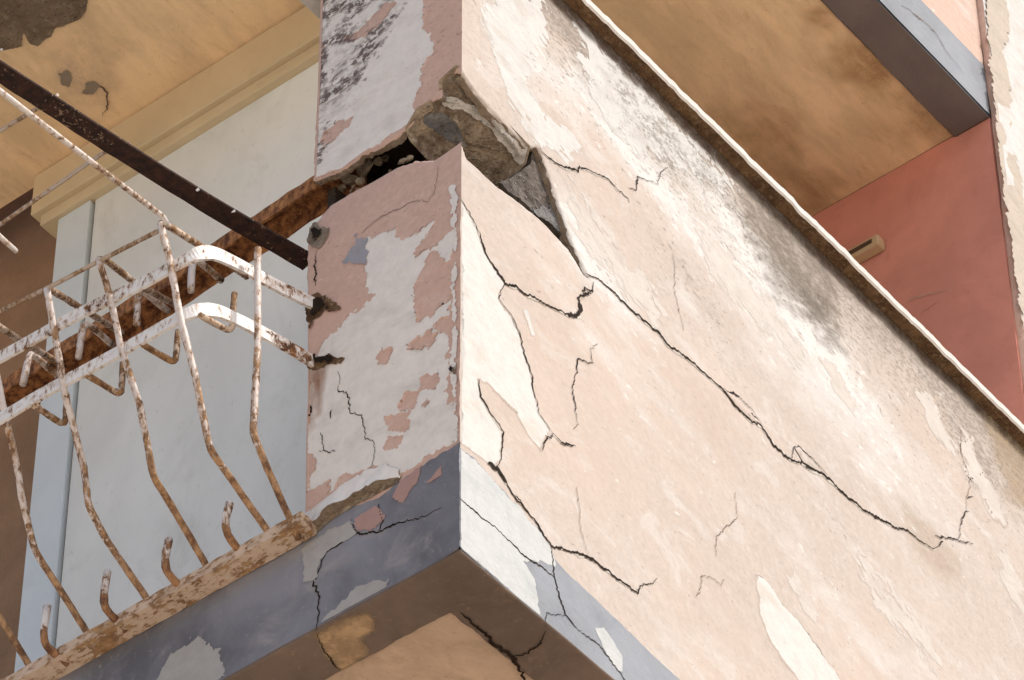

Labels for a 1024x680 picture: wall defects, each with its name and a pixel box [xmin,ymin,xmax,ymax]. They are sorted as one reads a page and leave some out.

peeling [0,0,88,51]
peeling [316,0,669,340]
crack [540,148,668,203]
peeling [985,0,1024,323]
peeling [301,184,556,615]
crack [459,197,973,551]
crack [308,371,657,680]
crack [697,492,737,595]
peeling [156,636,226,680]
peeling [321,579,389,623]
peeling [755,572,840,680]